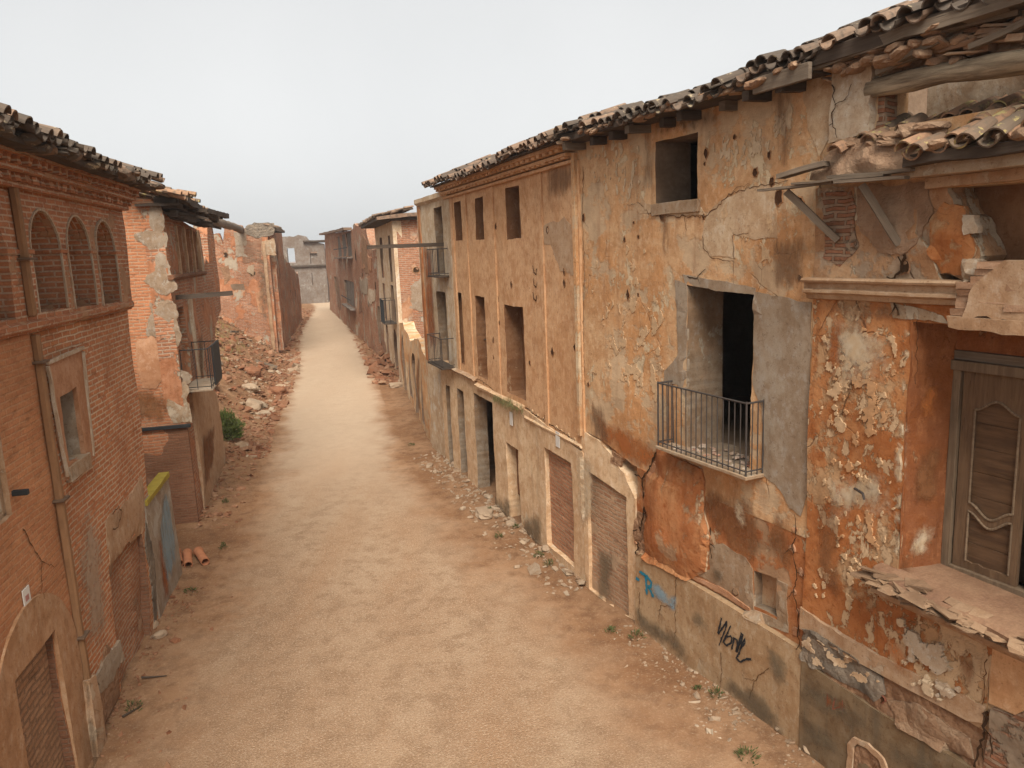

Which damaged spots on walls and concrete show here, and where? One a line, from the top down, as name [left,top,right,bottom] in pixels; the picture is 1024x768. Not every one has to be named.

crack [829,85,851,137]
flaking render [590,140,784,402]
crack [631,180,788,284]
flaking render [820,190,859,267]
peeling [819,311,907,447]
crack [633,452,656,555]
peeling [831,458,892,494]
crack [783,515,804,650]
peeling [812,567,829,598]
spalling [799,618,1024,768]
crack [966,659,993,768]